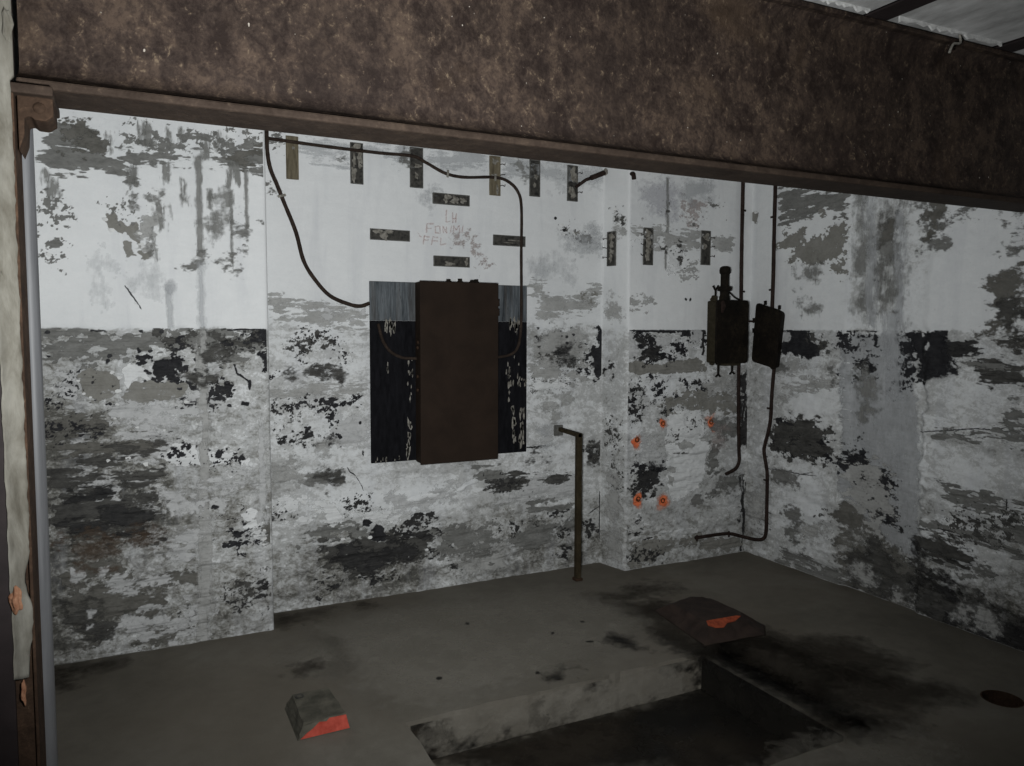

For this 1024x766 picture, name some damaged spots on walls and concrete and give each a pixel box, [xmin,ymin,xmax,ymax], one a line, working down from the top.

leakage [35,117,284,273]
peeling [608,205,735,283]
peeling [776,187,851,282]
leakage [854,195,907,311]
peeling [909,201,974,257]
peeling [41,293,368,456]
spalling [375,417,412,463]
peeling [506,277,657,449]
spalling [627,330,746,507]
spalling [781,330,1024,581]
spalling [261,509,270,546]
spalling [626,515,743,569]